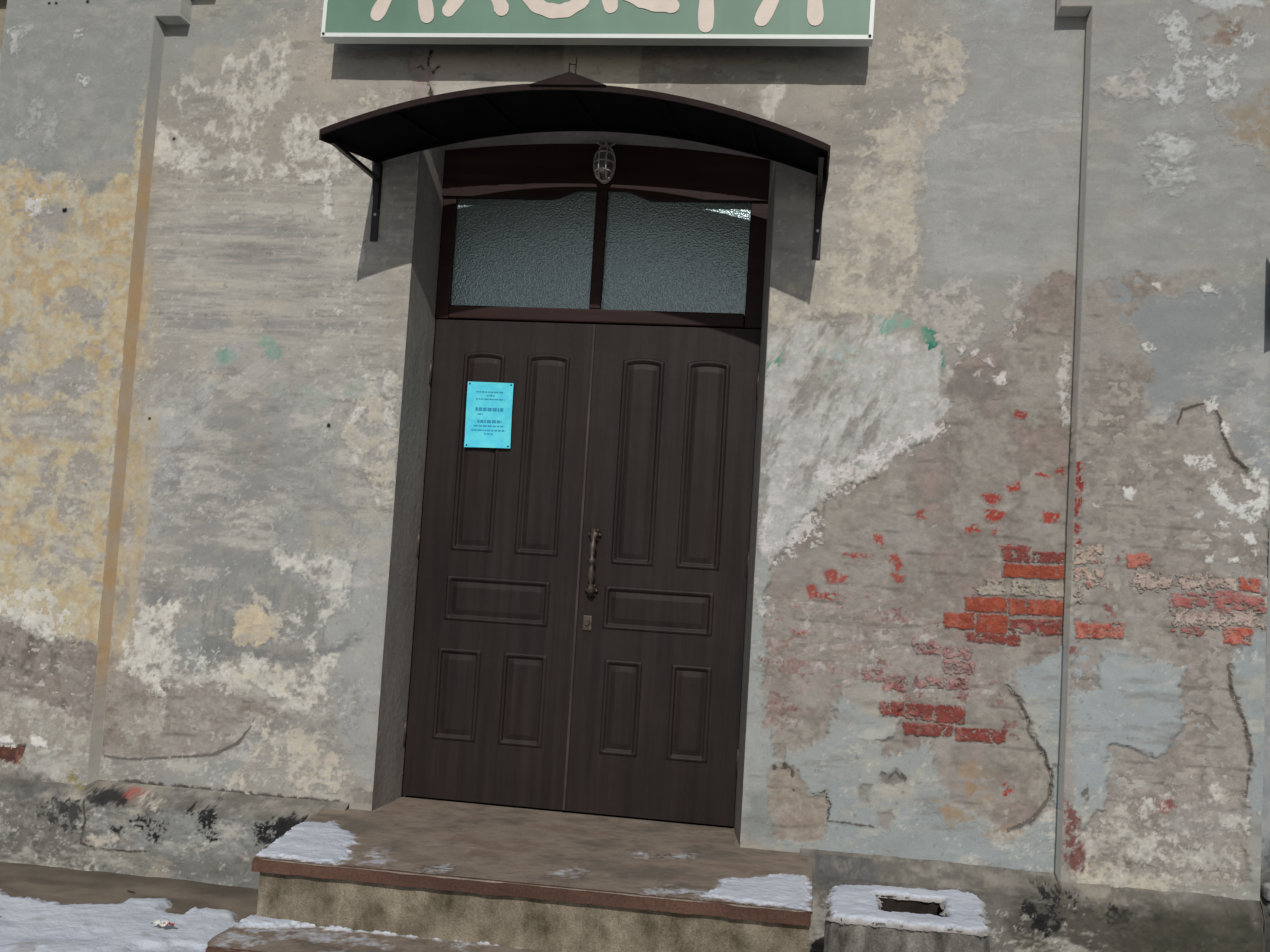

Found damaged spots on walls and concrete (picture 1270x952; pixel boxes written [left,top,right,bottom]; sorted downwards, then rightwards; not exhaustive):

peeling [0,23,433,807]
spalling [754,21,1269,892]
crack [1175,400,1251,472]
leakage [0,758,170,847]
crack [79,798,150,854]
leakage [183,795,224,844]
crack [103,716,342,803]
leakage [249,810,312,849]
leakage [1017,874,1090,941]
leakage [1260,829,1270,952]